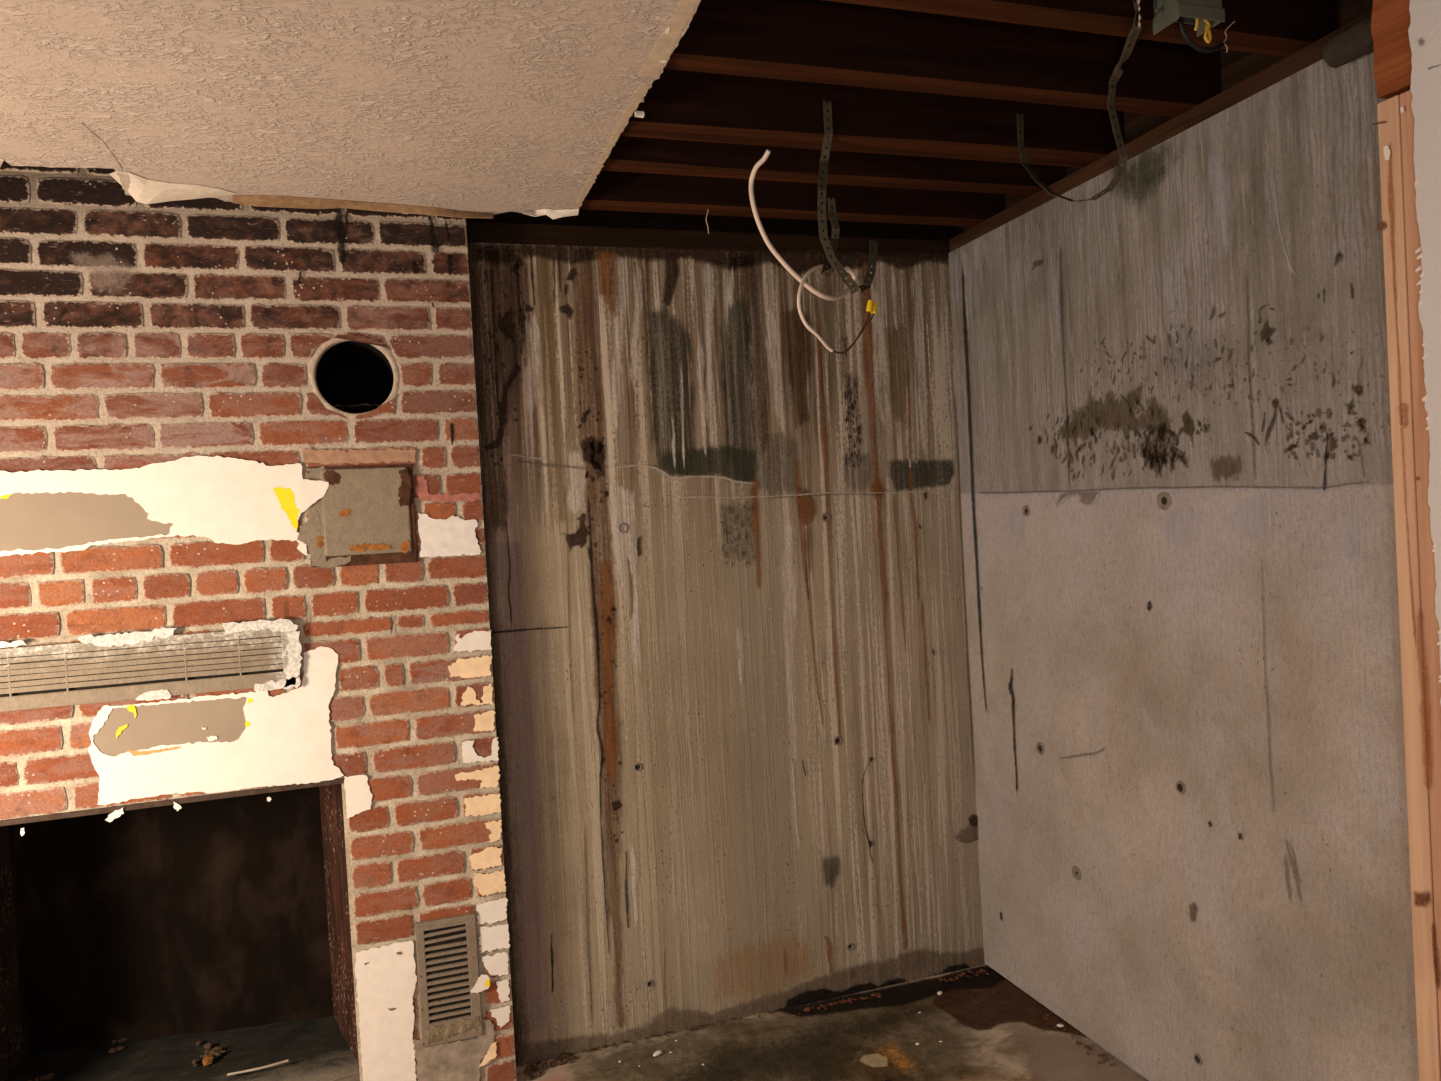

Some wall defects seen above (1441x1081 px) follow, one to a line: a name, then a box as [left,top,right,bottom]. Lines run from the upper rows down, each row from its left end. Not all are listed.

peeling [0,456,341,557]
peeling [88,646,373,822]
rust [349,540,410,554]
peeling [398,468,481,557]
peeling [448,630,511,1067]
rust [574,251,624,1026]
leakage [467,238,1087,1081]
rust [796,300,841,736]